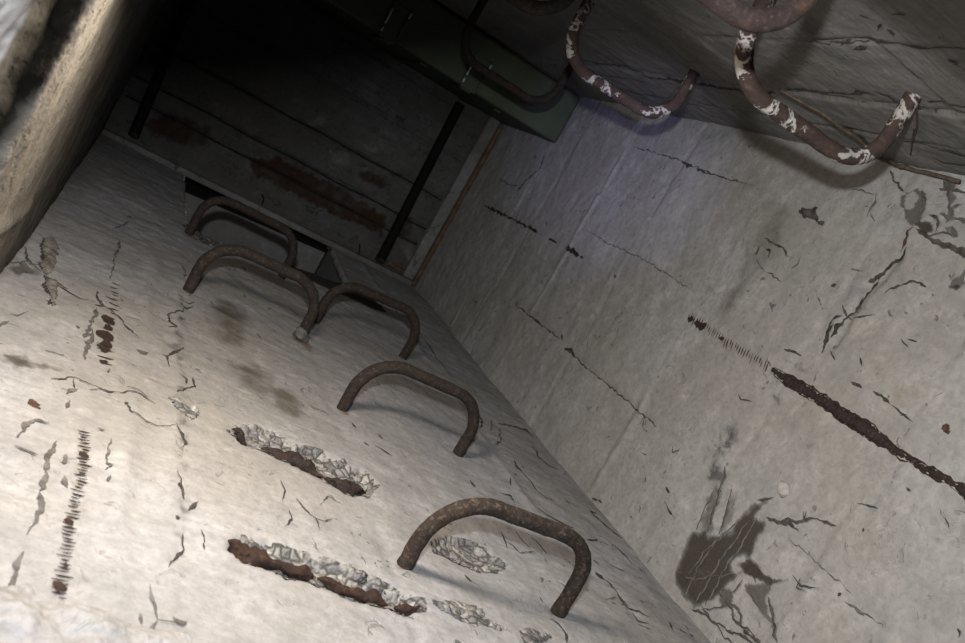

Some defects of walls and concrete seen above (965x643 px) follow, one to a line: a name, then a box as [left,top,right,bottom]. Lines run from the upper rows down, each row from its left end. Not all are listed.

rust [96,283,120,365]
crack [53,221,213,447]
crack [514,303,656,427]
crack [784,248,926,360]
crack [851,358,911,421]
crack [8,419,68,586]
rust [51,430,92,599]
crack [98,427,113,481]
crack [169,471,205,565]
spalling [226,424,380,498]
spalling [227,534,509,631]
spalling [520,627,552,643]